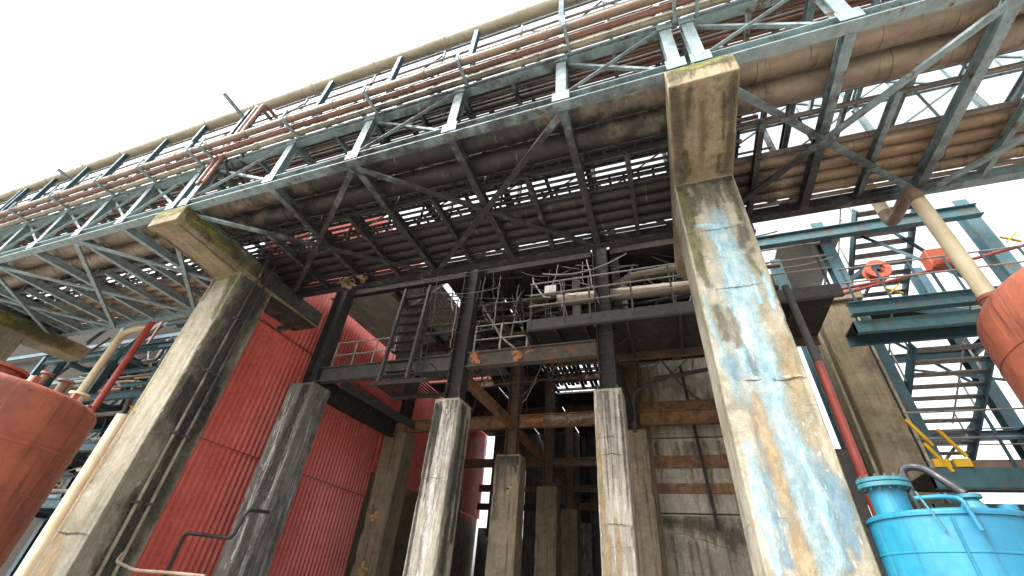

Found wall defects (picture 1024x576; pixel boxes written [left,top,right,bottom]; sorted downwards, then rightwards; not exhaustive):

leakage [670,74,738,190]
leakage [77,224,322,576]
leakage [404,402,442,576]
leakage [439,404,468,576]
leakage [618,394,628,501]
leakage [662,516,754,576]
crack [746,374,805,387]
leakage [694,206,860,576]